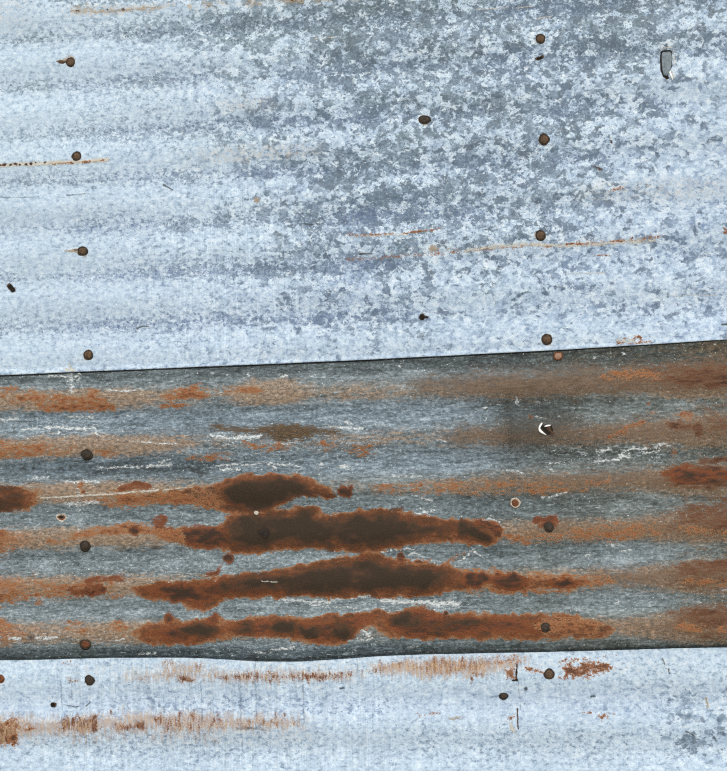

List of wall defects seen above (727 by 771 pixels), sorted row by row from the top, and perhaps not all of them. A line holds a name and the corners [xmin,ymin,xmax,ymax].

rust [0,157,109,167]
rust [159,374,262,410]
rust [593,356,727,392]
rust [0,385,135,436]
rust [0,402,727,655]
rust [154,661,352,684]
rust [362,654,543,681]
rust [558,657,629,680]
rust [0,710,300,749]